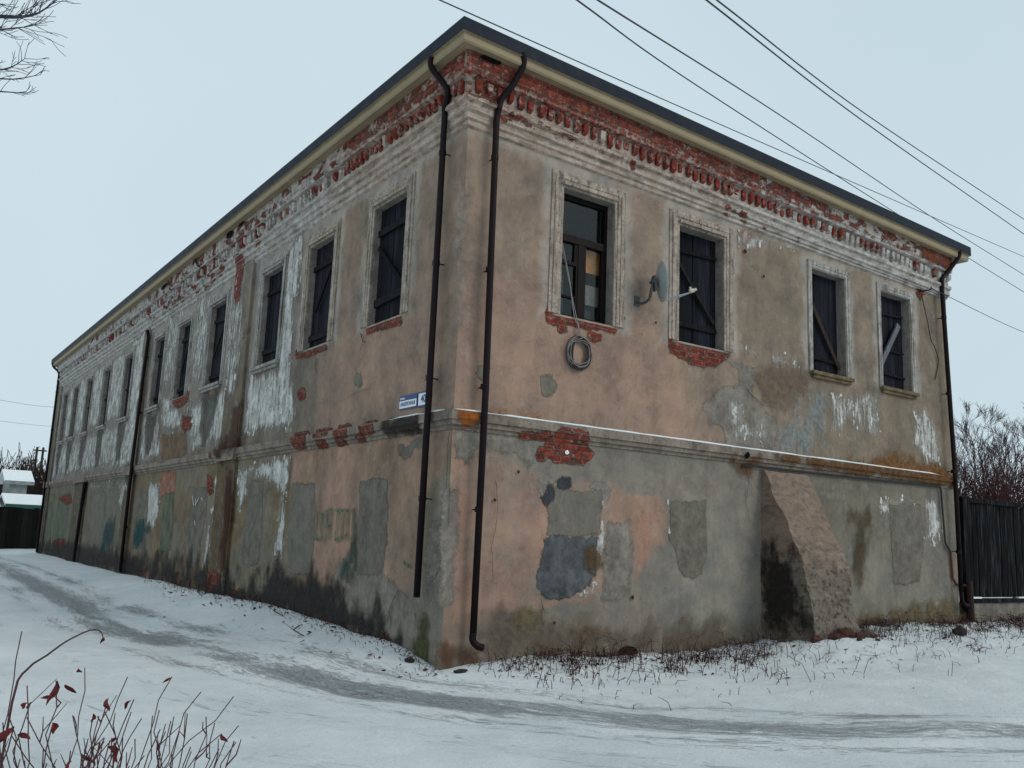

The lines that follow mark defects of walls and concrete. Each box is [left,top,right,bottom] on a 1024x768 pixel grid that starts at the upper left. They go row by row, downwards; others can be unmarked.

peeling [52,51,947,571]
damp [38,519,401,645]
damp [760,541,812,633]